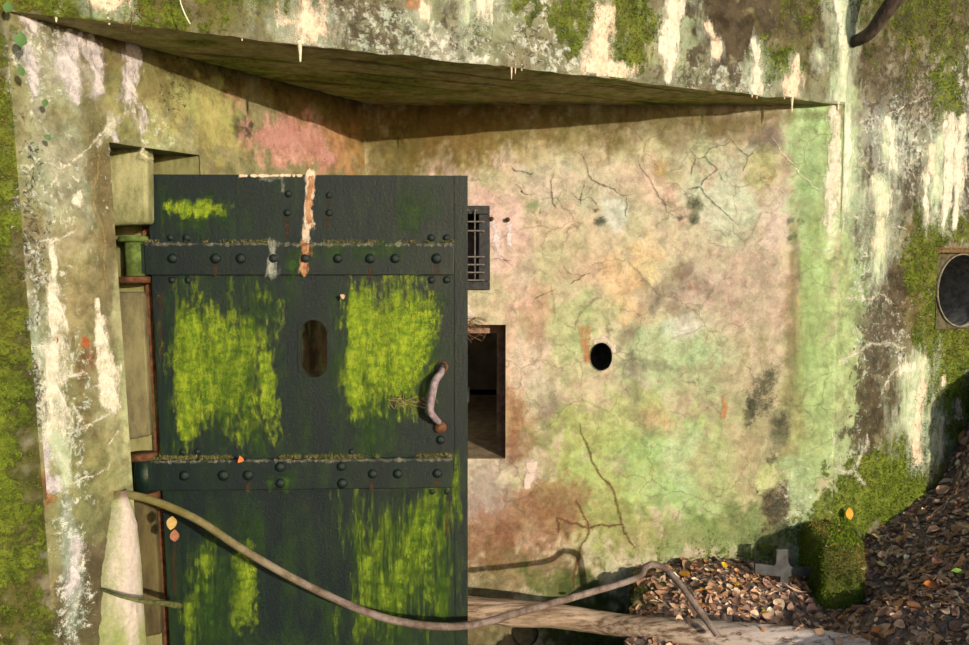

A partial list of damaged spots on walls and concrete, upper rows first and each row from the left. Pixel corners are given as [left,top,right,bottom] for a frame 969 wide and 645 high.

damp [21,16,37,33]
damp [56,29,104,106]
damp [122,43,147,136]
damp [72,190,83,206]
crack [512,154,670,214]
crack [691,139,785,220]
damp [867,117,901,278]
damp [921,112,967,230]
damp [38,241,74,493]
damp [94,298,122,414]
damp [898,350,966,468]
crack [556,430,636,589]